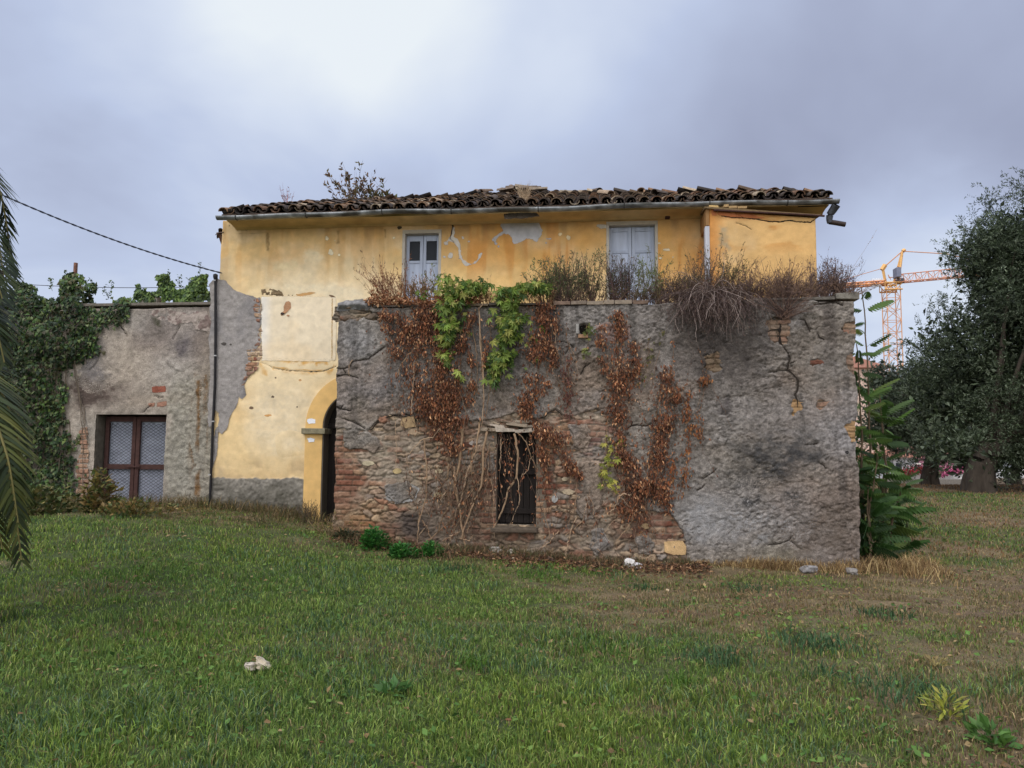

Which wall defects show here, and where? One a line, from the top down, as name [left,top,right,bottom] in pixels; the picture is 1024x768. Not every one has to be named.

peeling [443,227,482,266]
crack [723,215,815,230]
peeling [151,236,383,472]
crack [269,298,384,378]
crack [769,301,843,407]
spalling [332,407,687,564]